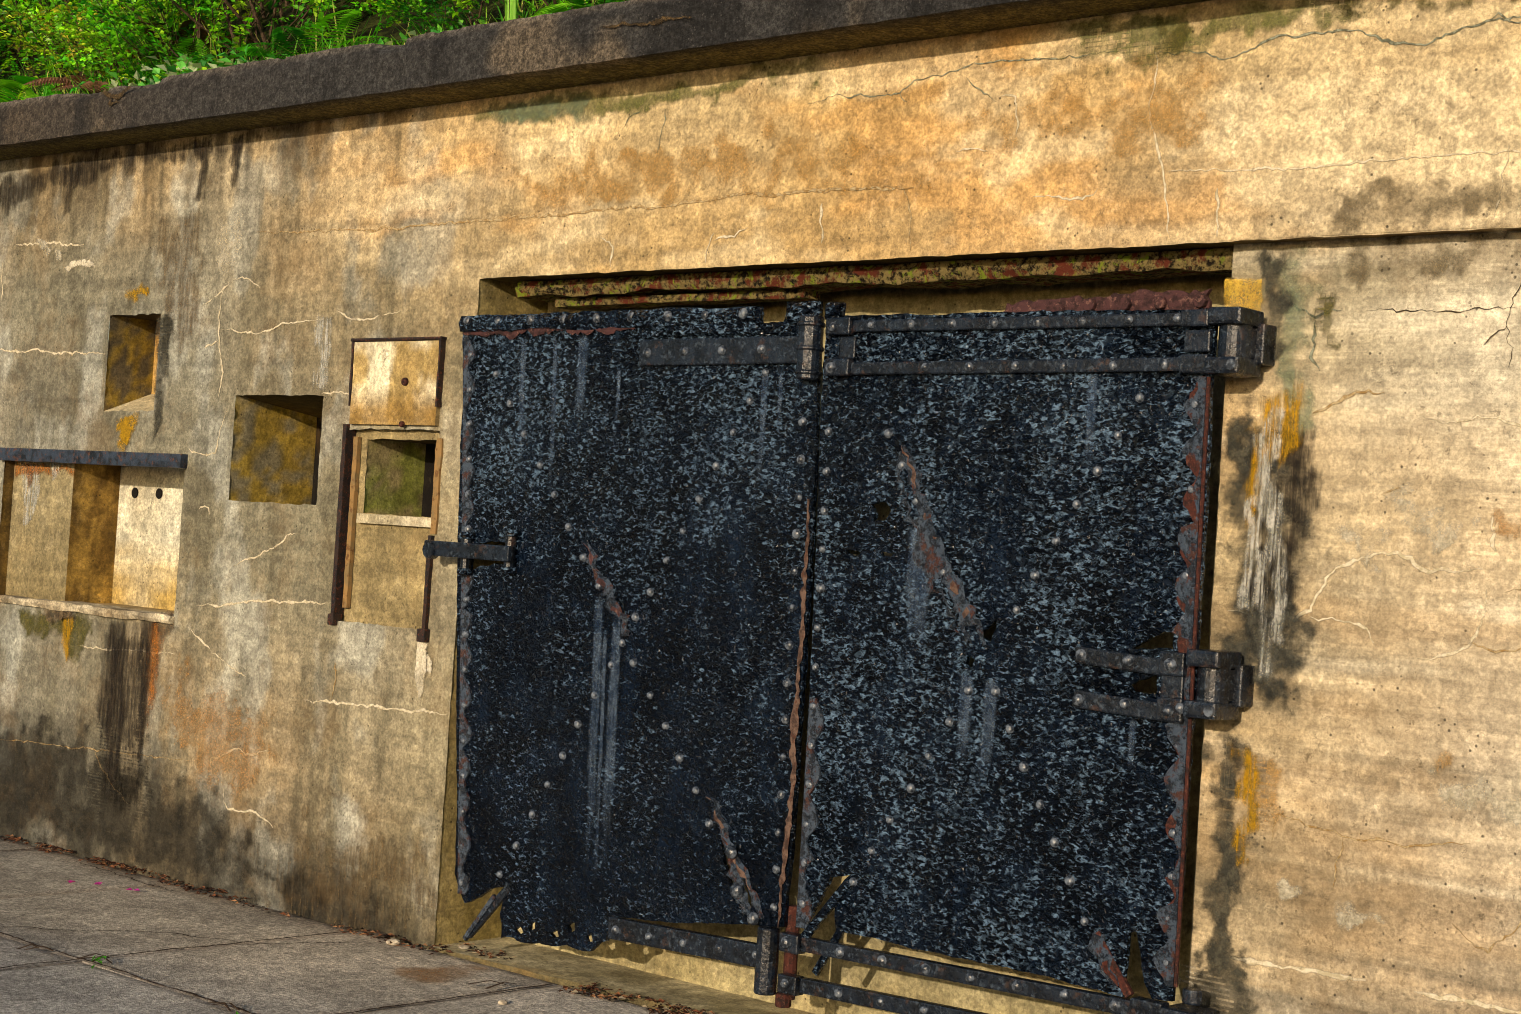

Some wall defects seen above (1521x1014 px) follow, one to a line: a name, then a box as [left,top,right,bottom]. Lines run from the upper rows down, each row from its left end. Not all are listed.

water stain [0,132,265,438]
crack [808,51,1114,152]
crack [1033,188,1098,201]
crack [1149,12,1521,237]
water stain [1348,252,1368,283]
water stain [1333,178,1396,229]
crack [1282,255,1521,413]
water stain [1422,235,1482,277]
water stain [1447,184,1500,214]
water stain [1210,249,1318,703]
crack [1298,515,1521,660]
water stain [0,609,433,921]